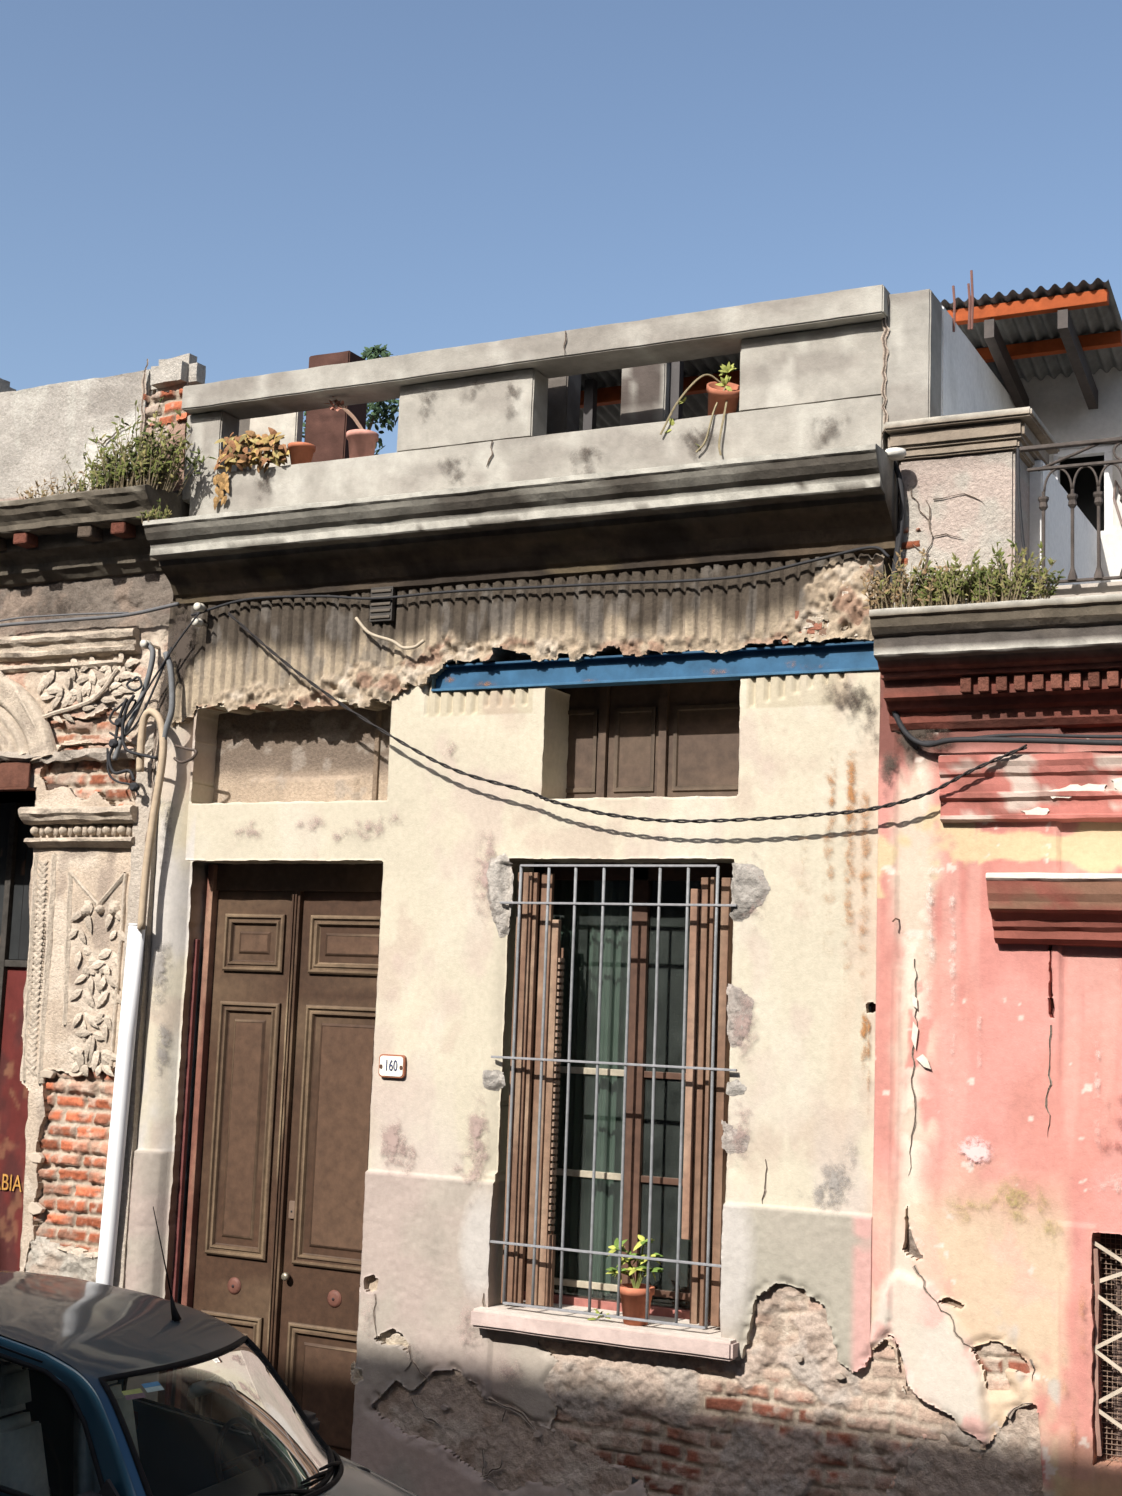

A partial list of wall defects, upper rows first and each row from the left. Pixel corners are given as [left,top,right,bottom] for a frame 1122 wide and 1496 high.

spalling [773,580,870,646]
spalling [0,707,137,806]
peeling [1023,778,1122,815]
crack [908,959,918,1175]
crack [1045,946,1055,1137]
spalling [25,1063,115,1282]
crack [905,1217,974,1349]
crack [373,1294,441,1427]
spalling [374,1283,1044,1496]